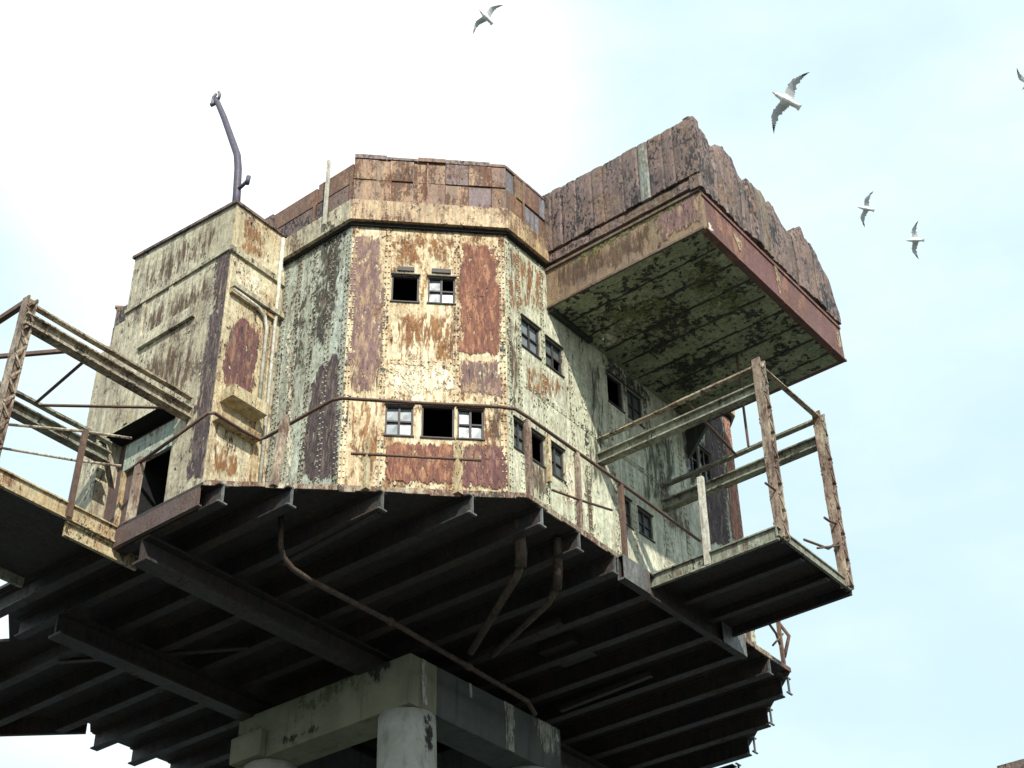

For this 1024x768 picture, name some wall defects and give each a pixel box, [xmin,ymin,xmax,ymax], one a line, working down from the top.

water stain [283,323,293,476]
peeling [283,234,503,483]
corrosion [507,224,661,402]